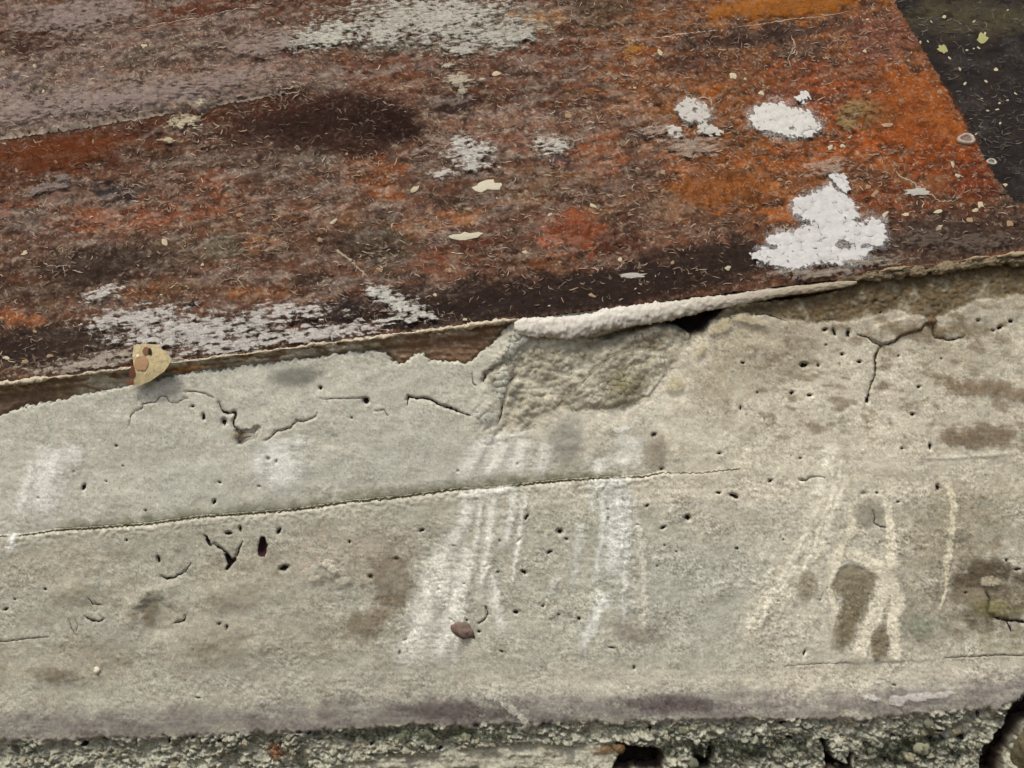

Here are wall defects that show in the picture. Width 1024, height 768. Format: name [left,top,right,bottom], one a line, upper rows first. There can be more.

crack [859,325,962,398]
crack [129,391,240,443]
crack [330,396,471,416]
crack [0,468,740,537]
crack [215,542,243,565]
water stain [399,422,666,662]
water stain [739,443,1004,662]
peeling [482,691,532,731]
hole [617,744,656,762]
peeling [752,723,772,734]
hole [979,693,1024,765]